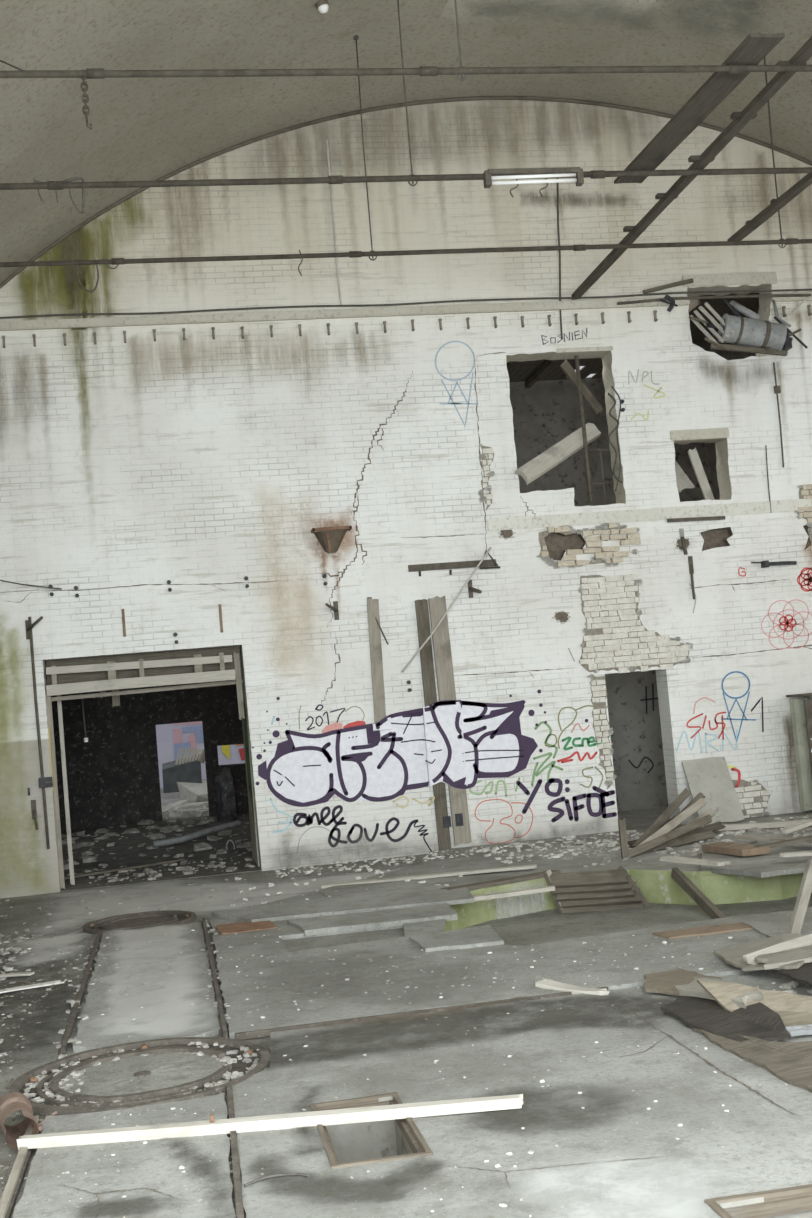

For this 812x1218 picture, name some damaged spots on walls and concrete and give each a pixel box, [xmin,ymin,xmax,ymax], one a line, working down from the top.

crack [0,370,413,703]
crack [404,352,506,550]
spalling [478,444,495,510]
spalling [794,484,812,550]
spalling [536,523,693,789]